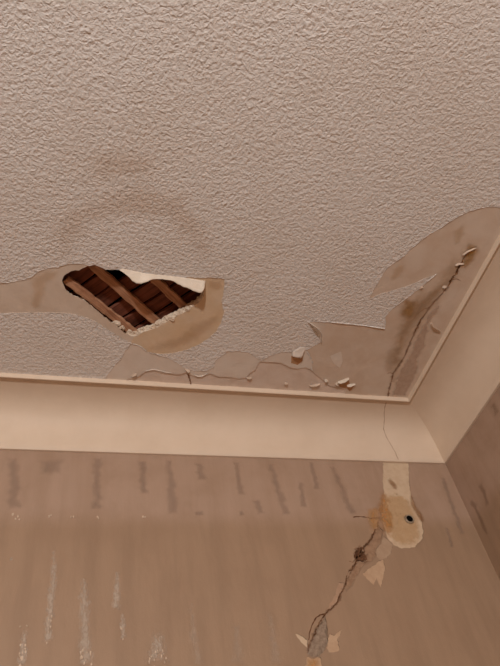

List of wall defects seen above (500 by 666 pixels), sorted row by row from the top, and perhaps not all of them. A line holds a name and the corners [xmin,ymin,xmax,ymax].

flaking render [121,280,205,339]
crack [383,248,477,460]
flaking render [296,617,341,666]
crack [307,516,379,653]